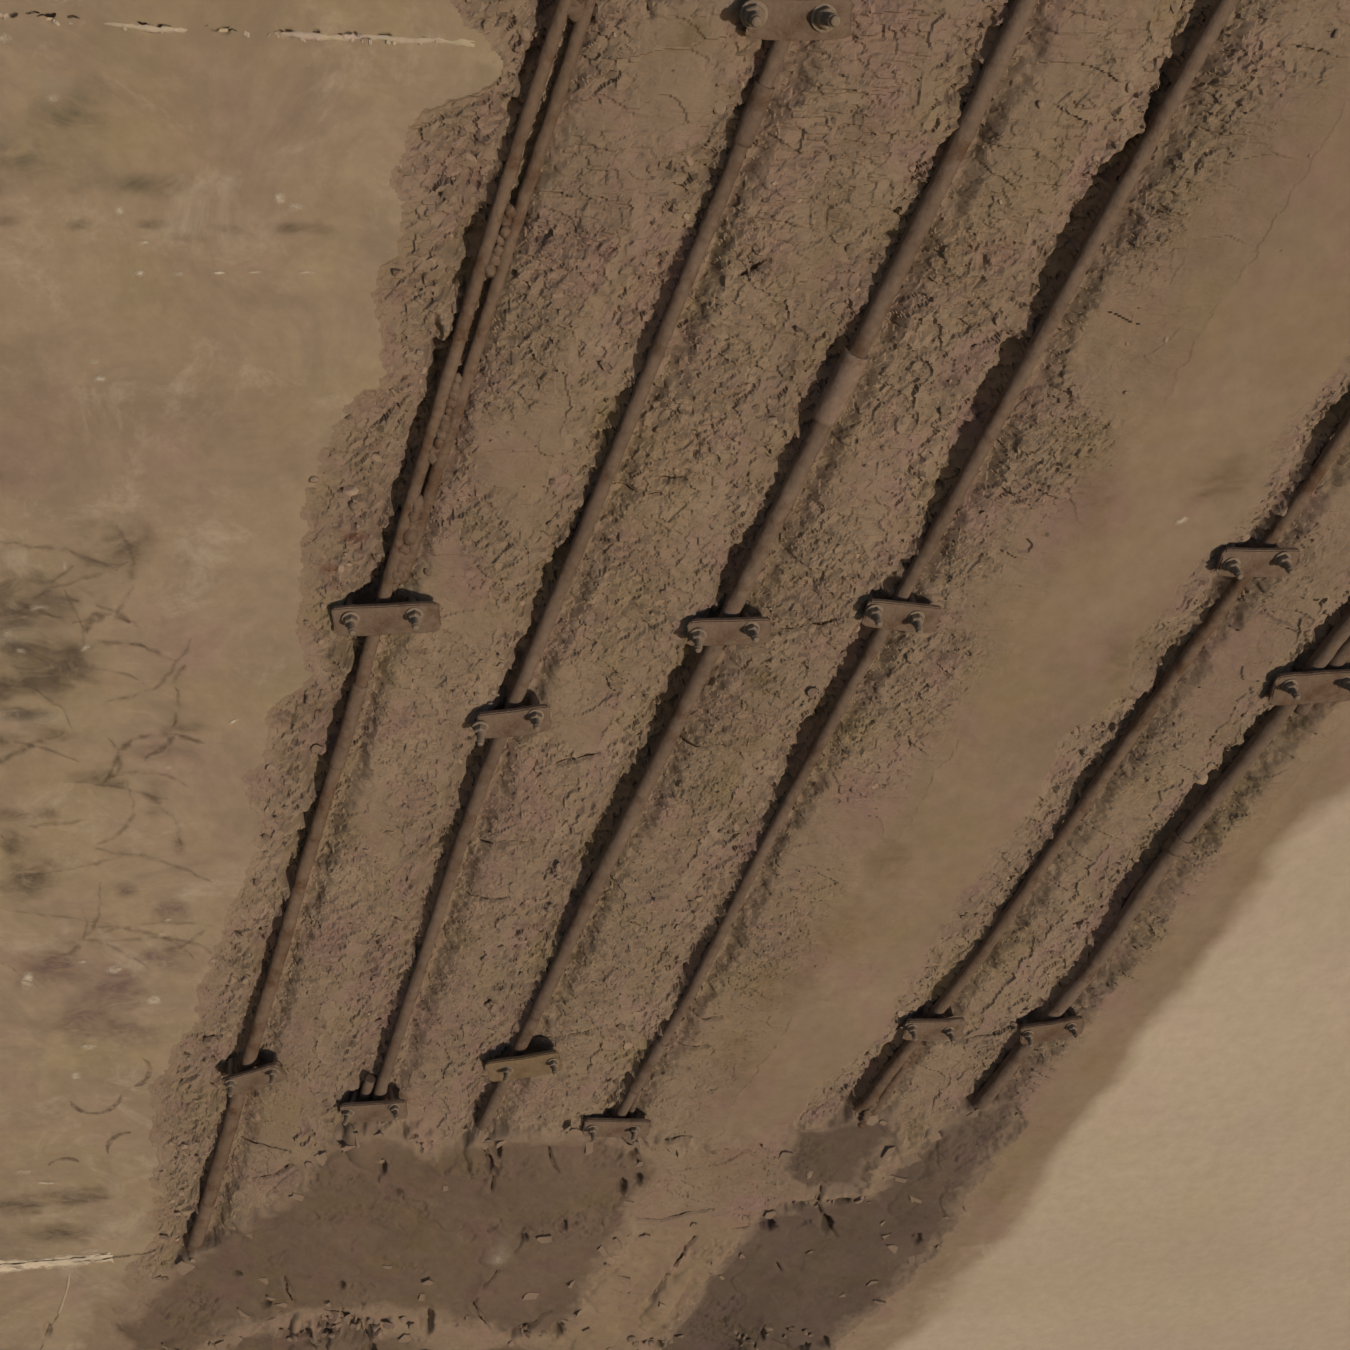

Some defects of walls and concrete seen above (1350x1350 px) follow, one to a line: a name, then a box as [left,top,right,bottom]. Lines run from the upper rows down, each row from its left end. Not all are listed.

crack [0,1250,155,1314]
spalling [276,1300,428,1350]
spalling [122,0,772,1292]
spalling [374,0,1350,1350]